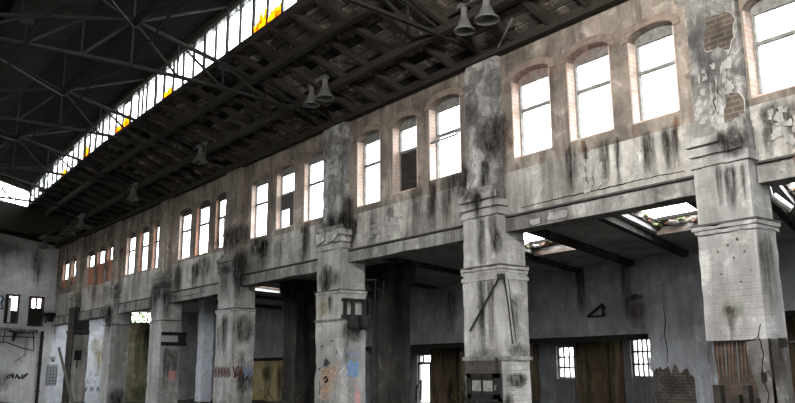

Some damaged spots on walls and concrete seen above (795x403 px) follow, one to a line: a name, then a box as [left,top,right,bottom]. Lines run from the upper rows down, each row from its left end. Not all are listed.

spalling [698,11,746,124]
damp [481,160,489,186]
damp [600,140,619,172]
damp [642,133,653,170]
damp [662,129,677,155]
damp [343,197,357,247]
damp [473,194,496,255]
damp [221,258,245,302]
crack [659,311,668,362]
crack [748,324,772,403]